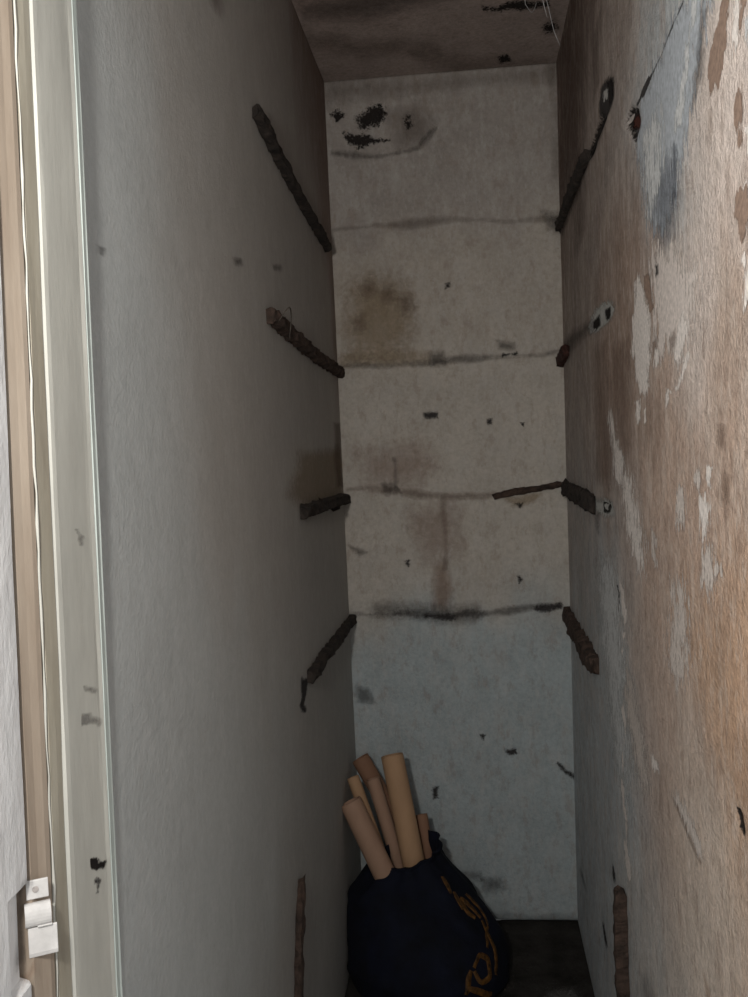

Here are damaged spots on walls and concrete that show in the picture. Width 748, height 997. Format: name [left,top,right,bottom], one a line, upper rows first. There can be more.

crack [637,3,683,105]
peeling [708,0,748,95]
spalling [329,104,390,150]
spalling [627,108,641,142]
water stain [635,0,715,240]
peeling [734,87,748,155]
peeling [734,179,748,315]
peeling [630,233,709,426]
peeling [673,464,723,607]
peeling [663,567,693,695]